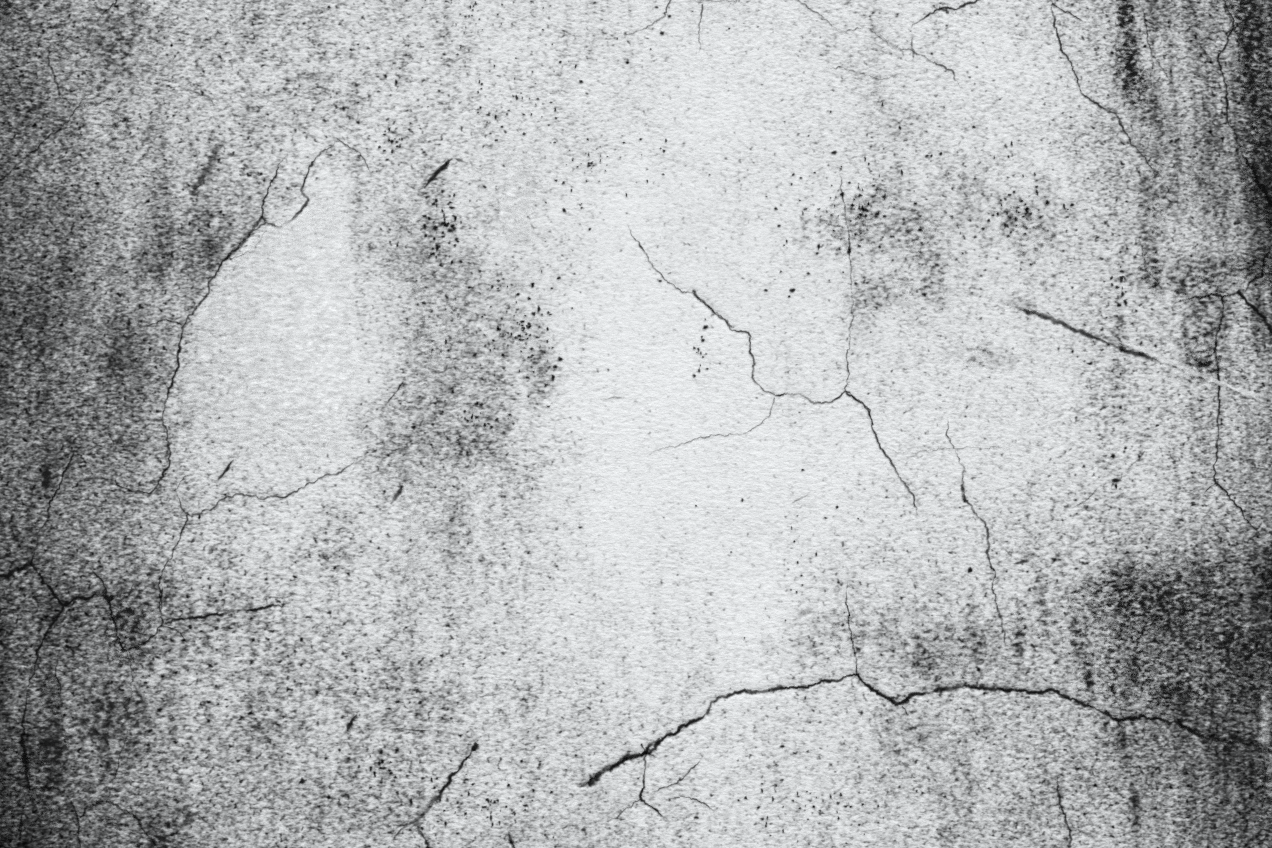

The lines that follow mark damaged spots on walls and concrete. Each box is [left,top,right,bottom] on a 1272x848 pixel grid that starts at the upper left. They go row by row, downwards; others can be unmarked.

crack [0,57,128,180]
crack [627,0,737,51]
crack [798,0,977,84]
crack [1051,3,1153,170]
crack [0,138,369,848]
crack [630,177,1006,642]
crack [587,581,1272,821]
crack [1057,777,1074,848]